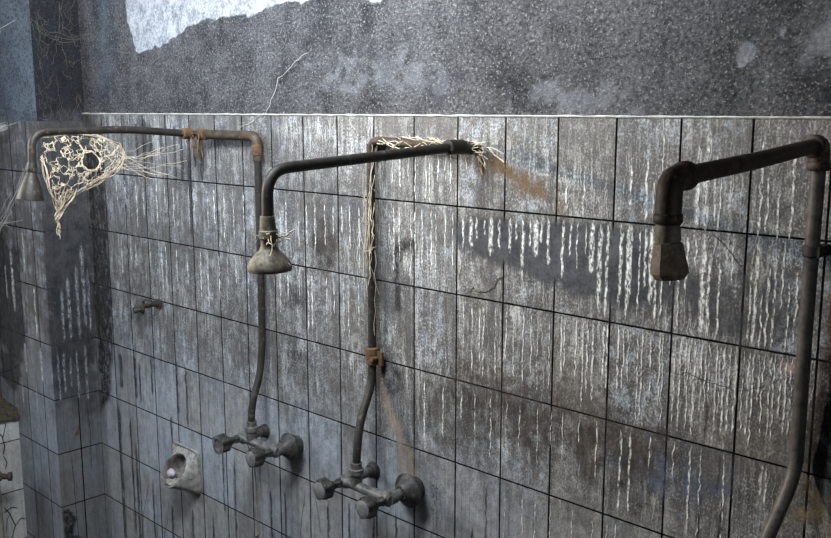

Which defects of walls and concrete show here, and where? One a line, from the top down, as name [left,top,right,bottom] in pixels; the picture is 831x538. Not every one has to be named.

peeling [126,0,308,53]
damp [173,128,204,235]
corrosion [479,156,546,198]
damp [758,168,780,233]
damp [0,236,27,405]
damp [36,110,123,411]
damp [494,308,538,380]
damp [393,178,798,348]
damp [560,321,795,440]
damp [118,408,142,538]
damp [458,387,675,510]
damp [683,450,727,538]